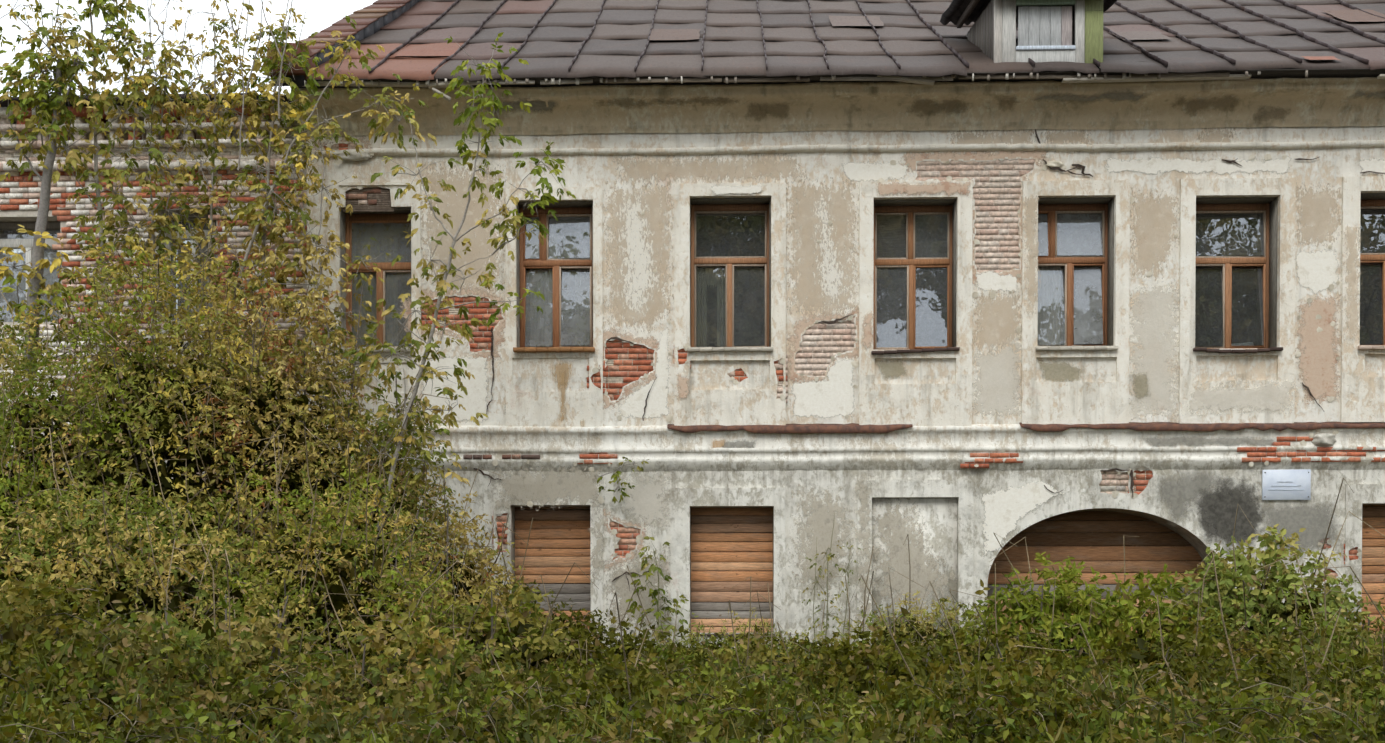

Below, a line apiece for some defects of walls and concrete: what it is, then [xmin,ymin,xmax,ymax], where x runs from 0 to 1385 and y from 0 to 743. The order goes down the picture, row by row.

peeling [1359,158,1385,176]
peeling [400,162,506,422]
peeling [586,130,1092,422]
peeling [1105,128,1291,420]
peeling [1295,183,1361,404]
peeling [463,452,674,632]
flaking render [960,449,1023,469]
peeling [981,481,1065,559]
flaking render [1099,468,1153,499]
water stain [1161,473,1335,555]
flaking render [1237,432,1385,467]